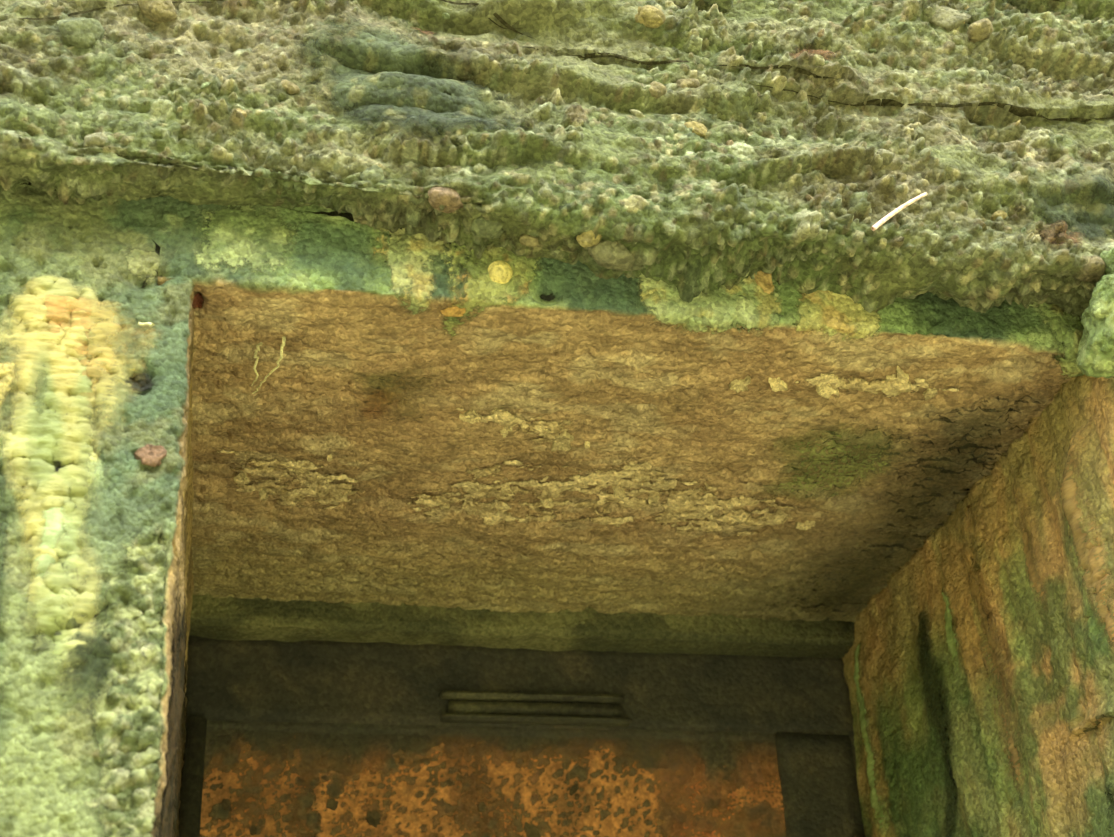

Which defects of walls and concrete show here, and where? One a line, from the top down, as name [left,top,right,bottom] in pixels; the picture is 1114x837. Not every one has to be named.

crack [441,0,1114,121]
water stain [0,463,9,620]
water stain [36,506,70,578]
water stain [813,405,1017,613]
water stain [65,634,111,700]
rust [200,744,784,837]
water stain [853,644,885,830]
water stain [917,611,956,837]